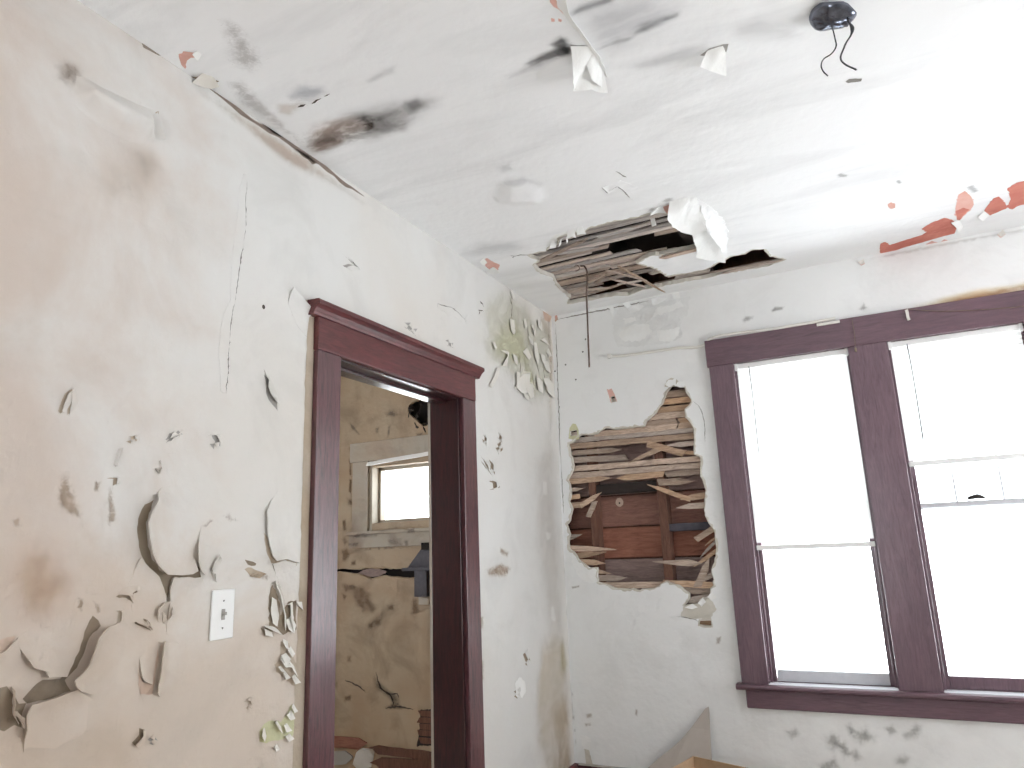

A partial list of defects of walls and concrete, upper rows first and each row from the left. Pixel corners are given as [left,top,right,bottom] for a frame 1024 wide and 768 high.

peeling [550,0,608,78]
crack [210,89,363,196]
peeling [549,227,586,249]
peeling [880,181,1024,253]
peeling [490,290,558,401]
flaking render [245,316,315,768]
spalling [565,378,718,628]
peeling [0,483,223,764]